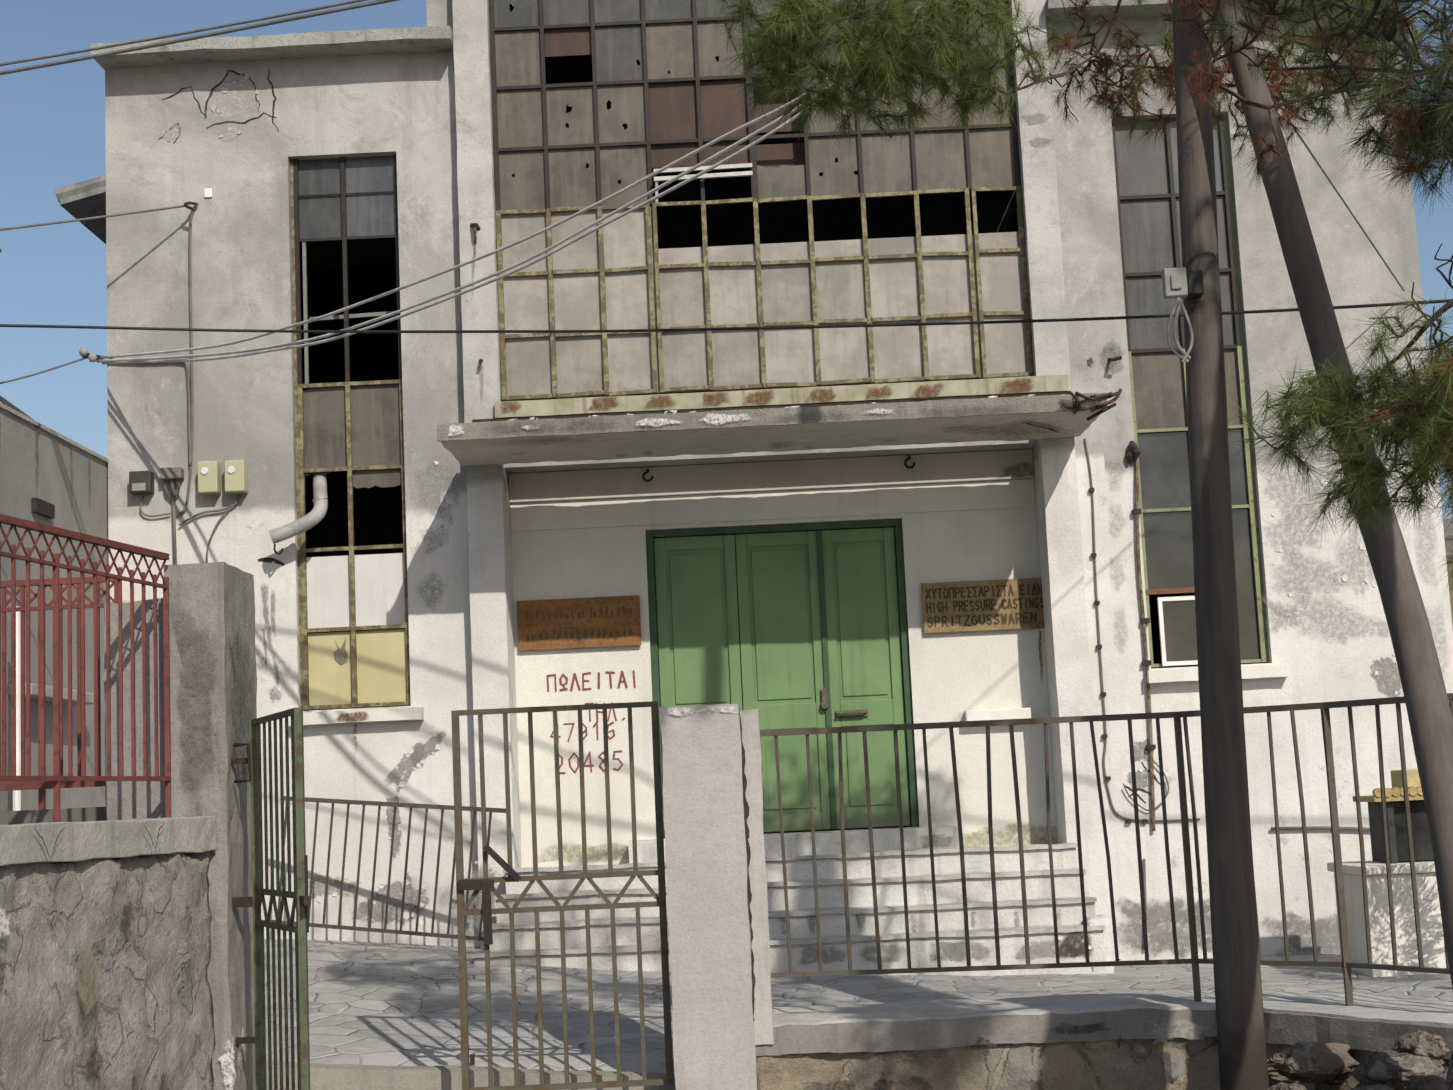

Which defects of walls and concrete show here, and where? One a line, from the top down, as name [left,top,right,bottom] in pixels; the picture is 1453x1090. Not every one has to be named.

crack [159,69,279,144]
rust [589,396,618,410]
rust [867,386,892,399]
rust [915,383,942,398]
peeling [383,731,445,860]
peeling [308,873,428,927]